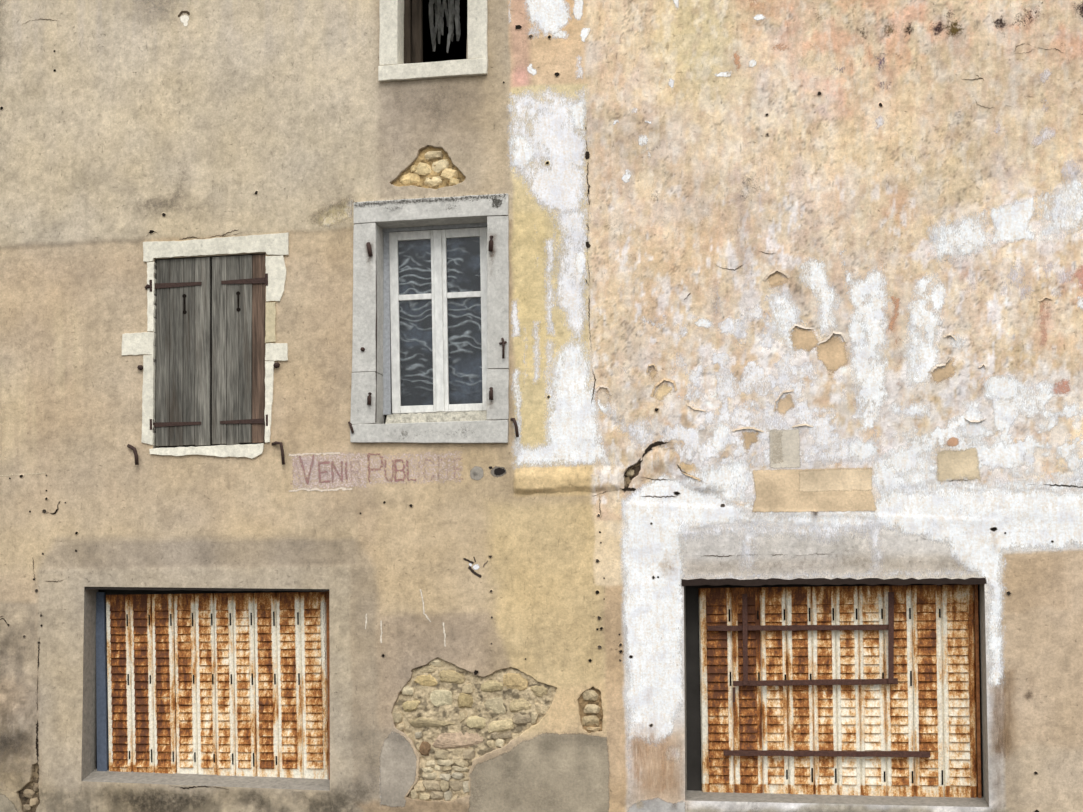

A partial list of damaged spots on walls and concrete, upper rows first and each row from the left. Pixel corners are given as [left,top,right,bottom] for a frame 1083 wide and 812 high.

spalling [178,11,190,26]
flaking render [392,147,466,189]
peeling [503,56,1083,763]
crack [594,441,705,515]
flaking render [392,658,557,801]
flaking render [18,764,40,812]